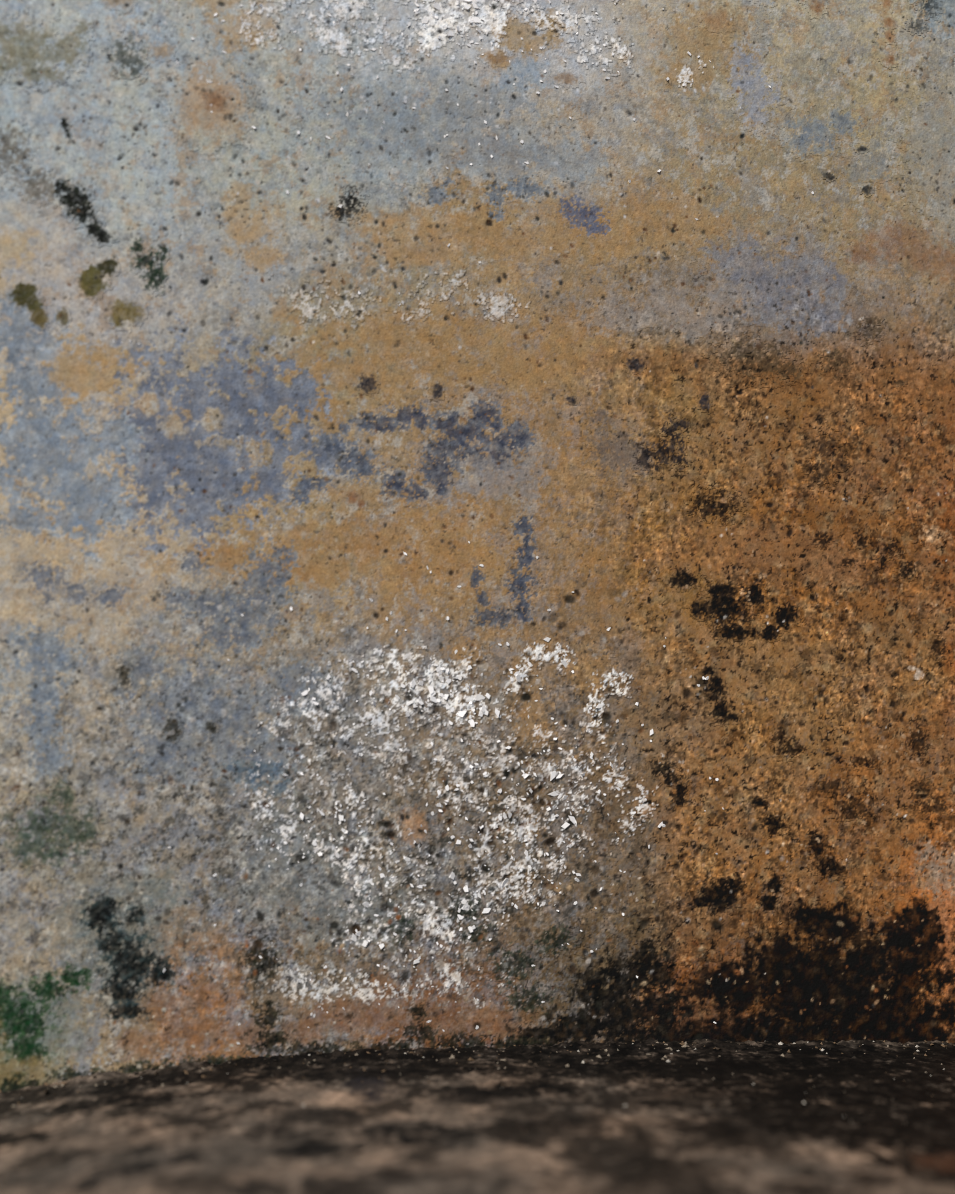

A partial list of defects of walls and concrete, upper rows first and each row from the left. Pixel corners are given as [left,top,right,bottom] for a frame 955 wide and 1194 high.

water stain [101,28,149,85]
water stain [159,0,774,140]
mould [683,482,746,527]
corrosion [598,512,891,588]
mould [808,527,920,582]
water stain [667,566,804,647]
water stain [113,658,133,689]
water stain [697,663,740,726]
water stain [928,626,948,664]
water stain [158,498,692,1028]
water stain [766,728,809,763]
water stain [899,717,955,826]